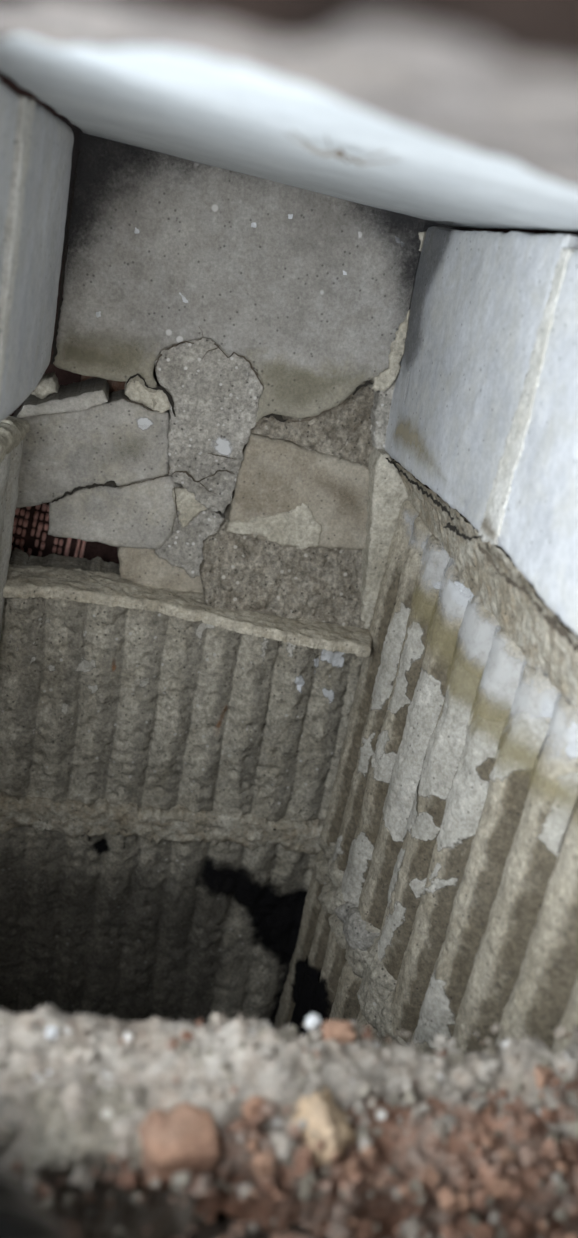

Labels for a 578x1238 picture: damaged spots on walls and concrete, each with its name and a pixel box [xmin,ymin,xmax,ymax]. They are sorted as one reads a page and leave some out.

crack [122,327,373,422]
crack [51,453,234,523]
peeling [433,581,474,601]
crack [386,458,578,652]
peeling [358,603,553,961]
peeling [538,722,578,856]
peeling [332,832,374,905]
peeling [412,970,455,1048]